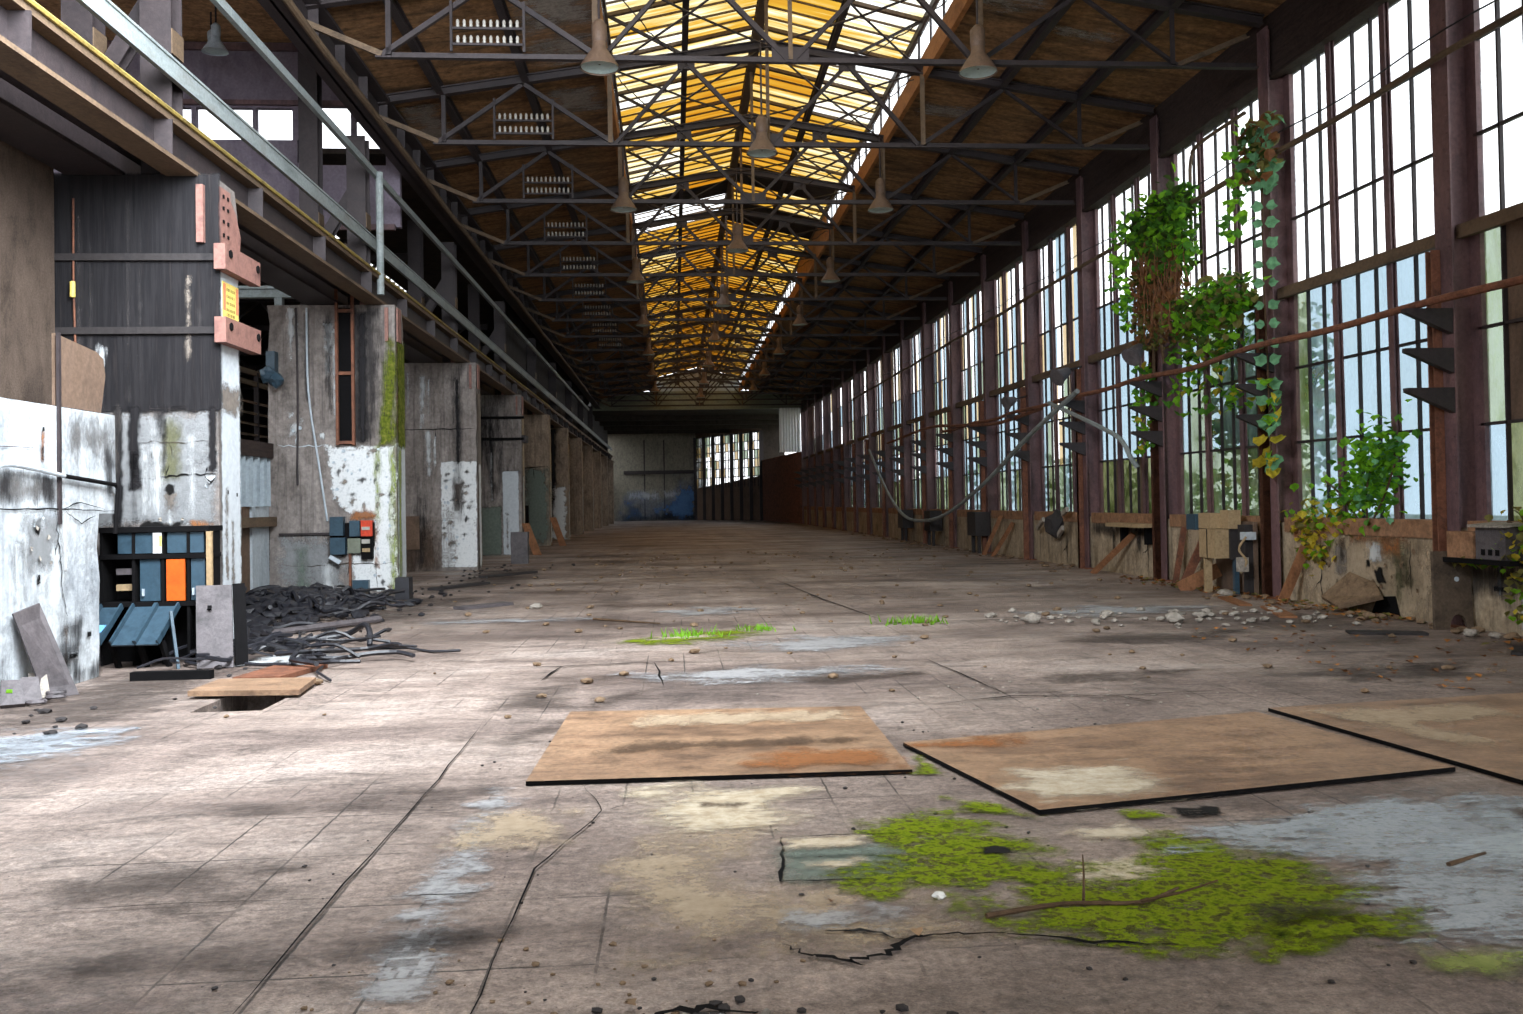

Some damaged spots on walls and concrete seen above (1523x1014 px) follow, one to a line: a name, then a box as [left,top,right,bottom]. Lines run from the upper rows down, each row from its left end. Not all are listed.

damp [1,470,10,501]
damp [43,476,72,570]
damp [106,384,240,527]
peeling [320,433,404,592]
damp [357,312,426,589]
crack [778,833,883,882]
damp [1169,792,1523,960]
crack [784,928,1179,965]
spalling [643,1003,771,1014]